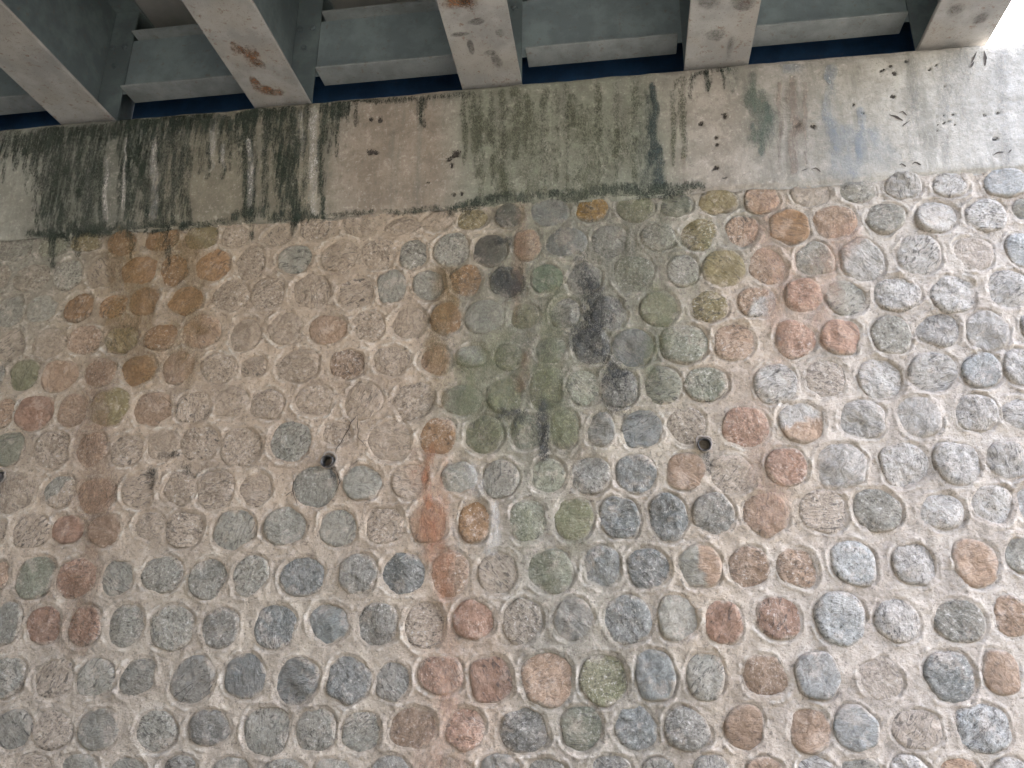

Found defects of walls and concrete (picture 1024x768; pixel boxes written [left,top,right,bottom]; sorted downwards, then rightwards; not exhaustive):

damp [0,101,358,268]
rust [230,42,282,95]
damp [459,89,508,196]
damp [595,68,733,188]
damp [569,256,634,412]
damp [537,399,549,459]